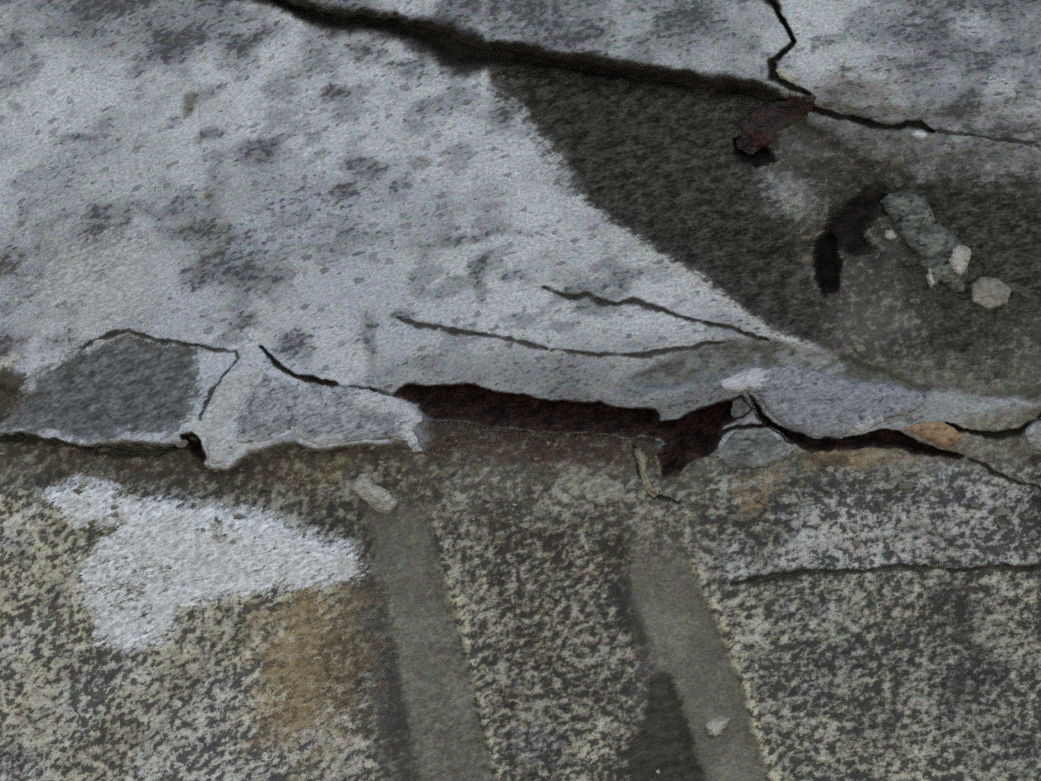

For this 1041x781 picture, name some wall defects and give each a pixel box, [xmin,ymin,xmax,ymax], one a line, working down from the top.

crack [222,0,1041,148]
crack [396,286,769,358]
spalling [0,332,423,464]
peeling [720,364,962,448]
damp [43,473,368,654]
crack [731,563,1041,587]